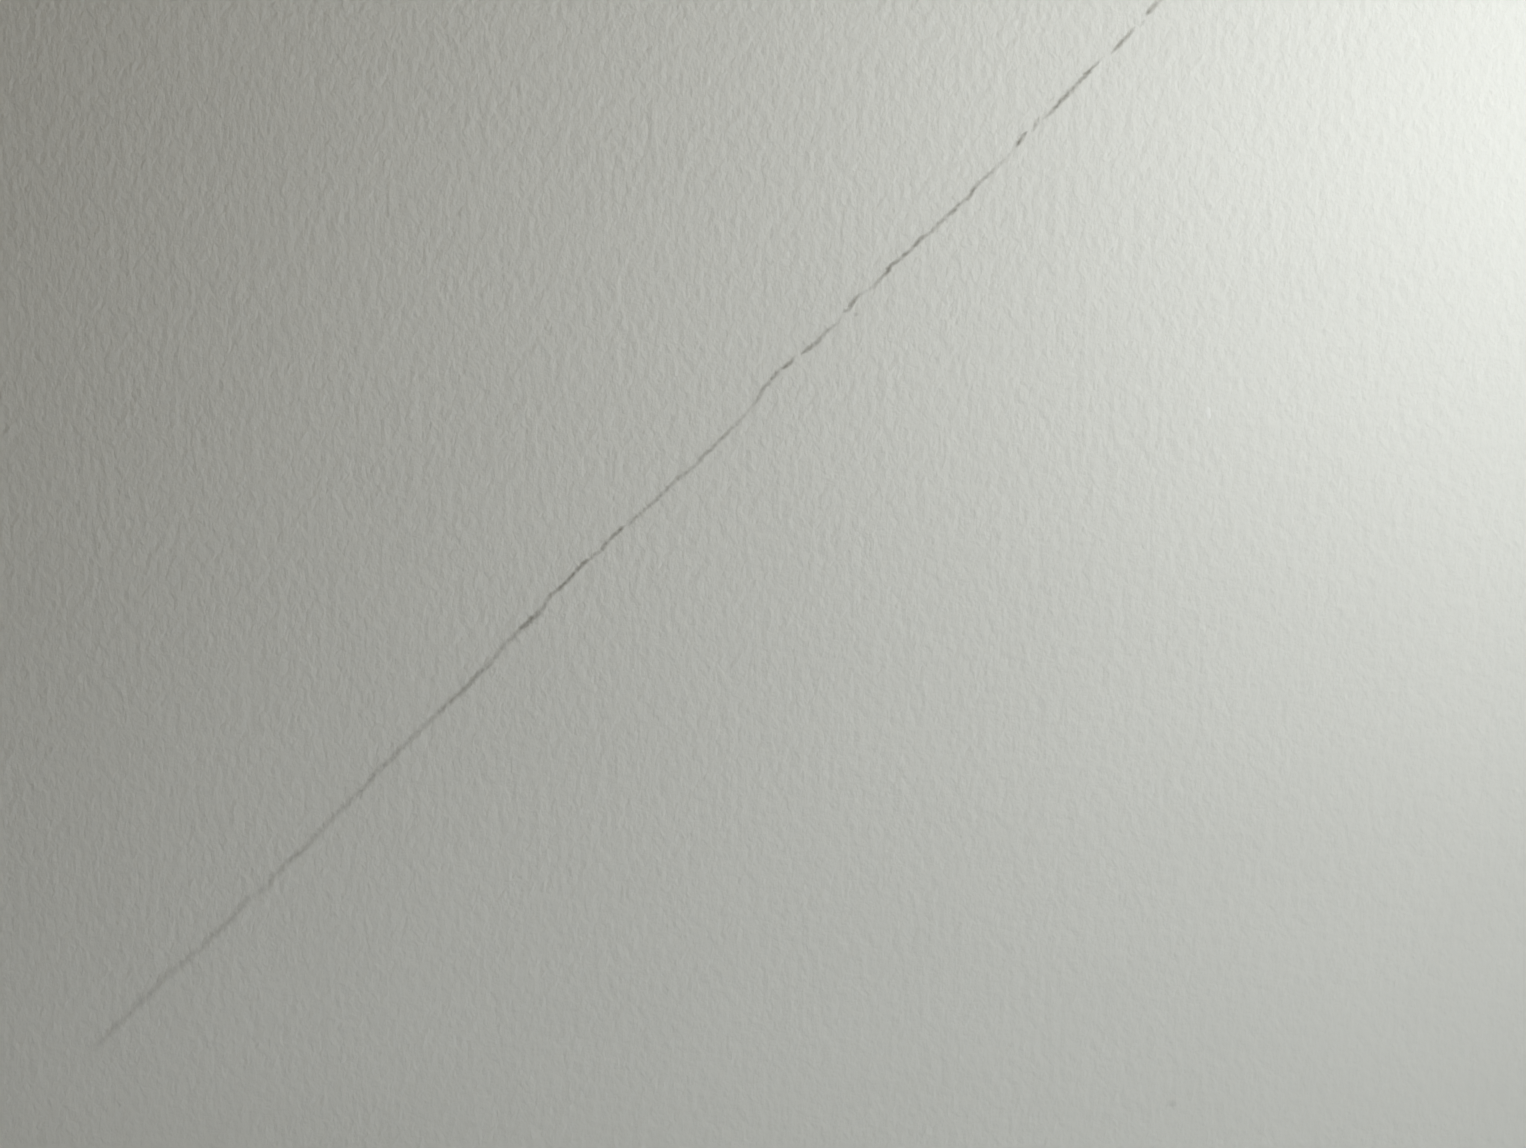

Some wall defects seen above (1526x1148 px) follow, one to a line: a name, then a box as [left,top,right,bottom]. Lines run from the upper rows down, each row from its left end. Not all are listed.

crack [88,0,1168,1054]